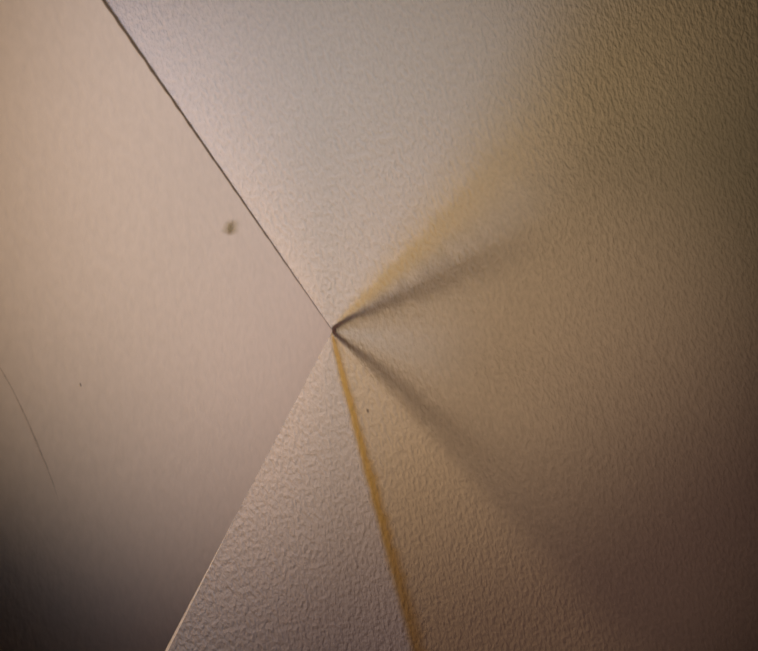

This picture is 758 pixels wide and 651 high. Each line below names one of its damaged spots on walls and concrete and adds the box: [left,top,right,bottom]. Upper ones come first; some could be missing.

leakage [334,341,408,620]